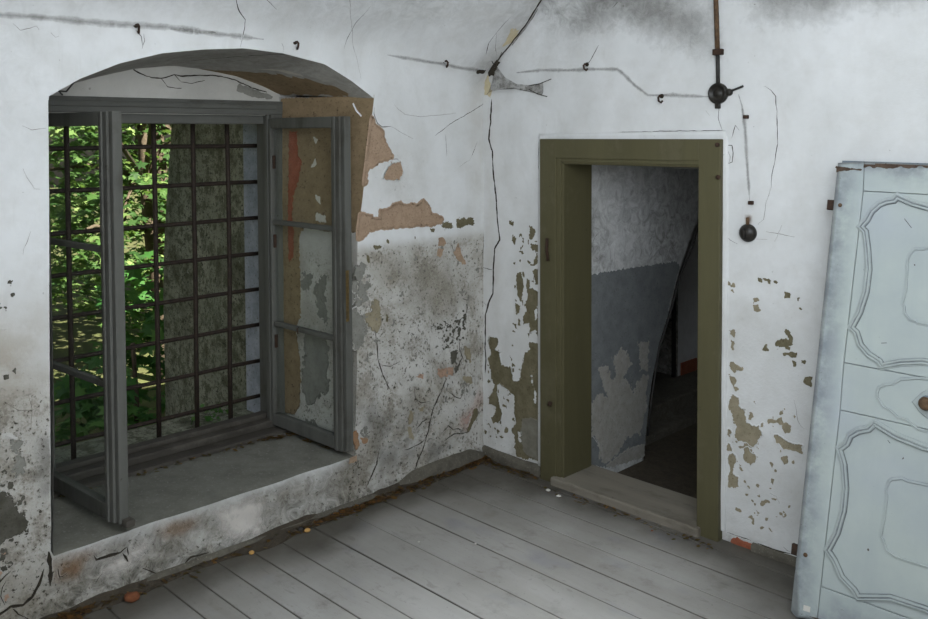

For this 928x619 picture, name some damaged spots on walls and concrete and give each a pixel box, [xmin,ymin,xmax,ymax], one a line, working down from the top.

crack [133,0,284,92]
flaking render [476,60,500,97]
flaking render [202,69,478,446]
crack [353,99,502,373]
crack [368,301,400,390]
peeling [460,220,538,462]
peeling [762,329,806,367]
crack [404,379,467,470]
peeling [726,362,805,532]
peeling [0,437,32,576]
crack [0,551,70,619]